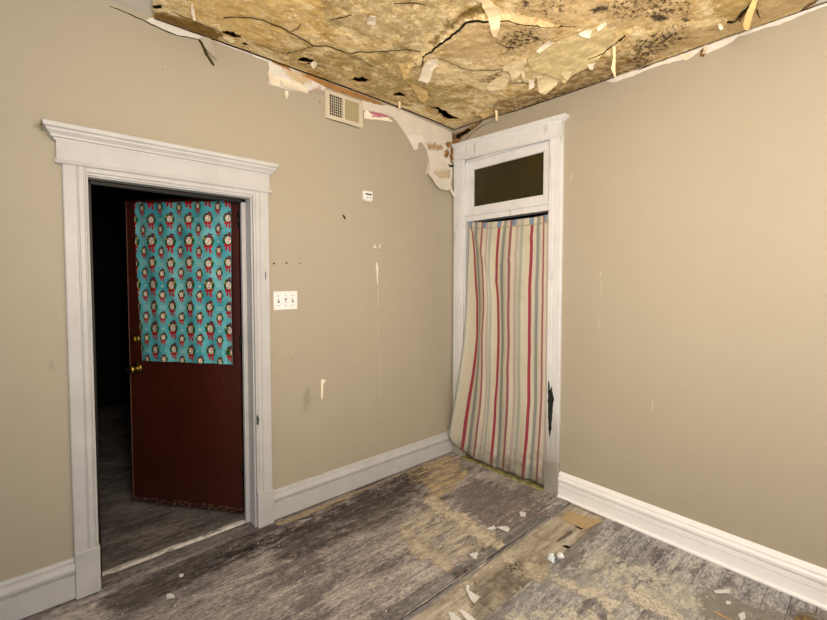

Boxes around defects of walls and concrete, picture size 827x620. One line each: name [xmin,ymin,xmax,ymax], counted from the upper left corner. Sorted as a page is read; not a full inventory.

peeling [147,17,498,197]
crack [110,6,626,149]
peeling [476,0,501,37]
peeling [486,57,573,95]
peeling [578,22,607,38]
leakage [433,0,813,121]
peeling [606,0,827,82]